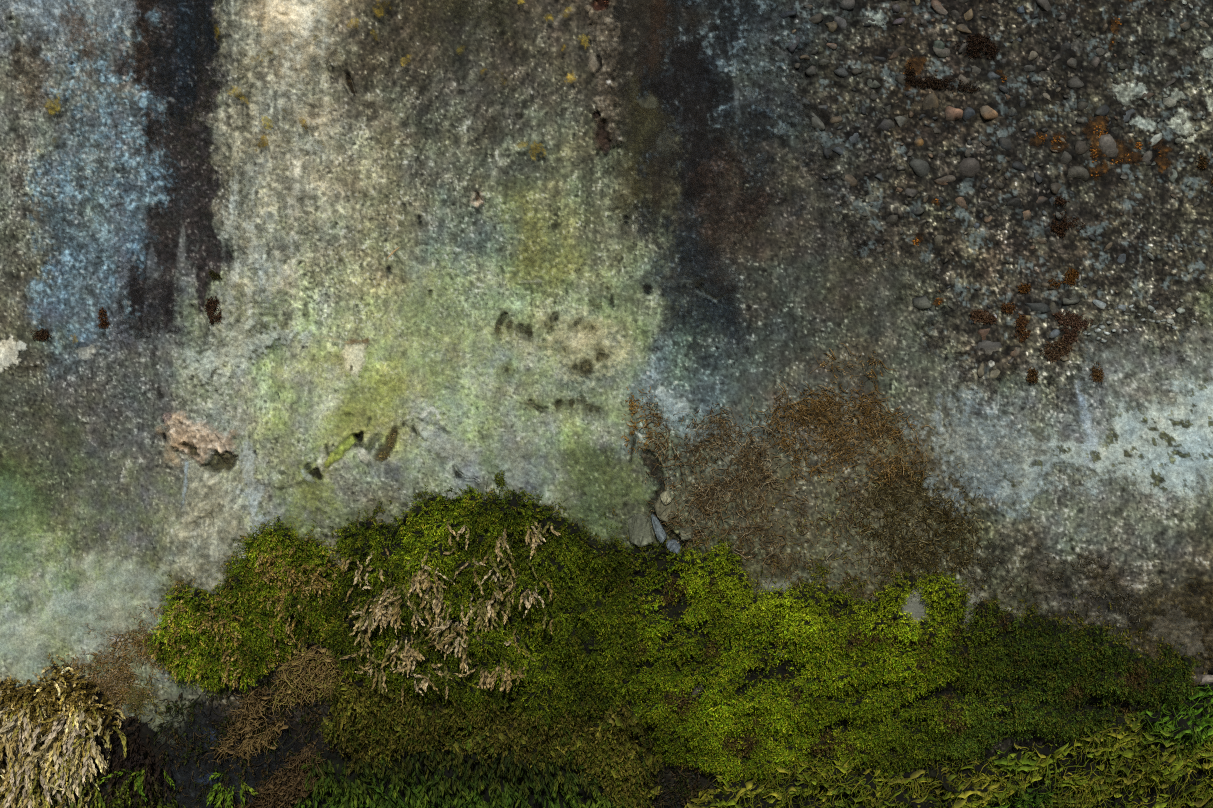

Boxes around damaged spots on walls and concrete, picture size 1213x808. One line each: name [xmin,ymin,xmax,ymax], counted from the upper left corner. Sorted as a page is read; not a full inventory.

leakage [0,0,340,537]
spalling [156,412,239,594]